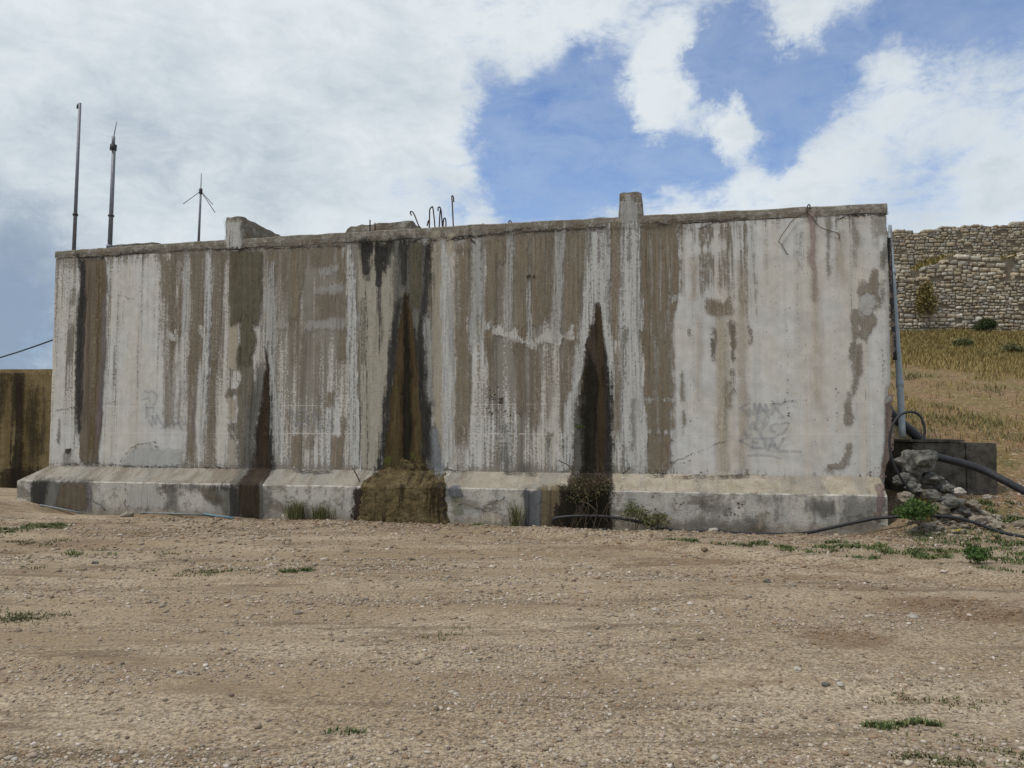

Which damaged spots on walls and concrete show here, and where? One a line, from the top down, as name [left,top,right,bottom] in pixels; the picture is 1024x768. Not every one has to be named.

water stain [0,373,93,511]
water stain [205,221,280,519]
water stain [342,235,463,521]
water stain [466,195,648,529]